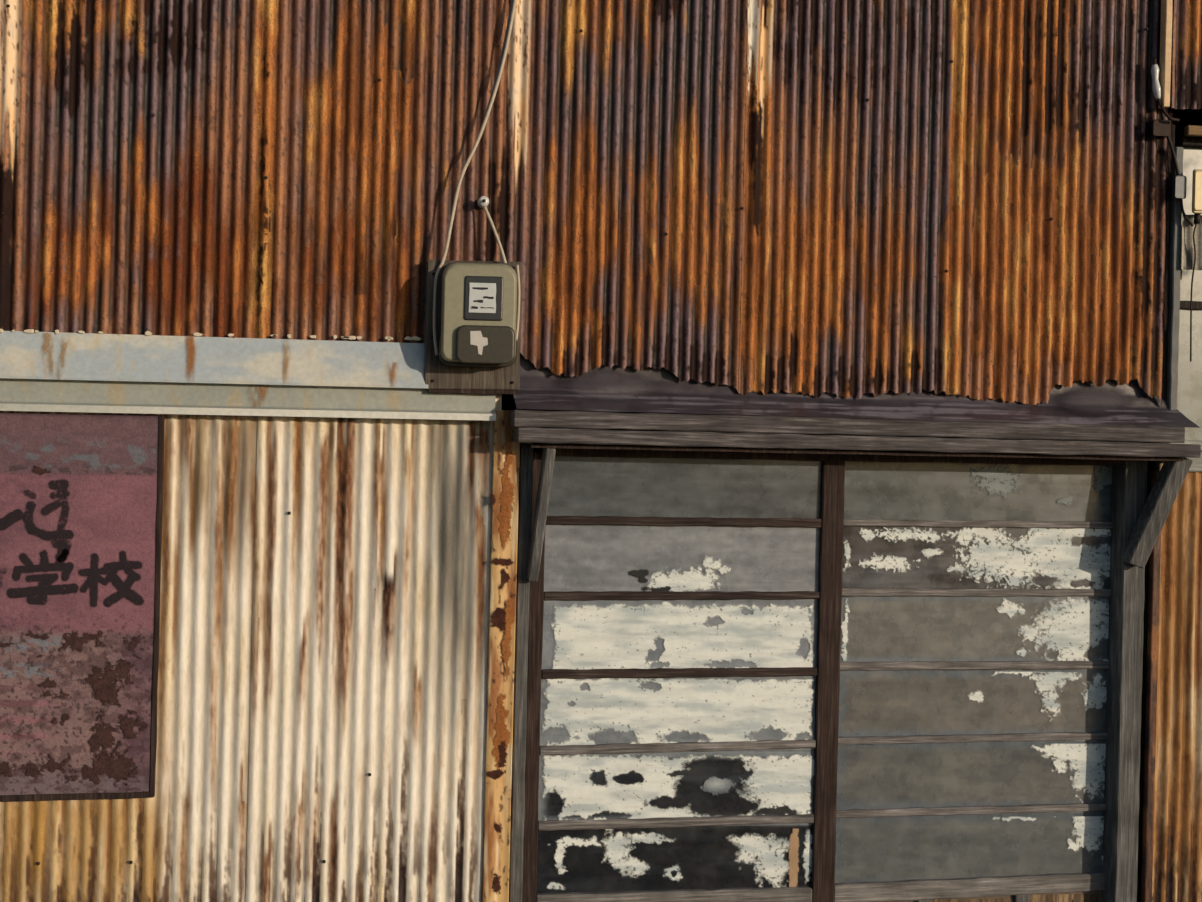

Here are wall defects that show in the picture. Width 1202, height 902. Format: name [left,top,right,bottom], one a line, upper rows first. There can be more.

corrosion [131,0,280,374]
corrosion [299,0,421,342]
corrosion [534,0,1202,401]
leakage [194,452,203,527]
corrosion [261,754,437,902]
leakage [436,425,480,640]
corrosion [455,749,477,902]
peeling [542,556,814,890]
peeling [841,600,850,661]
peeling [843,526,1111,721]
peeling [1031,744,1106,799]
peeling [1067,816,1104,860]